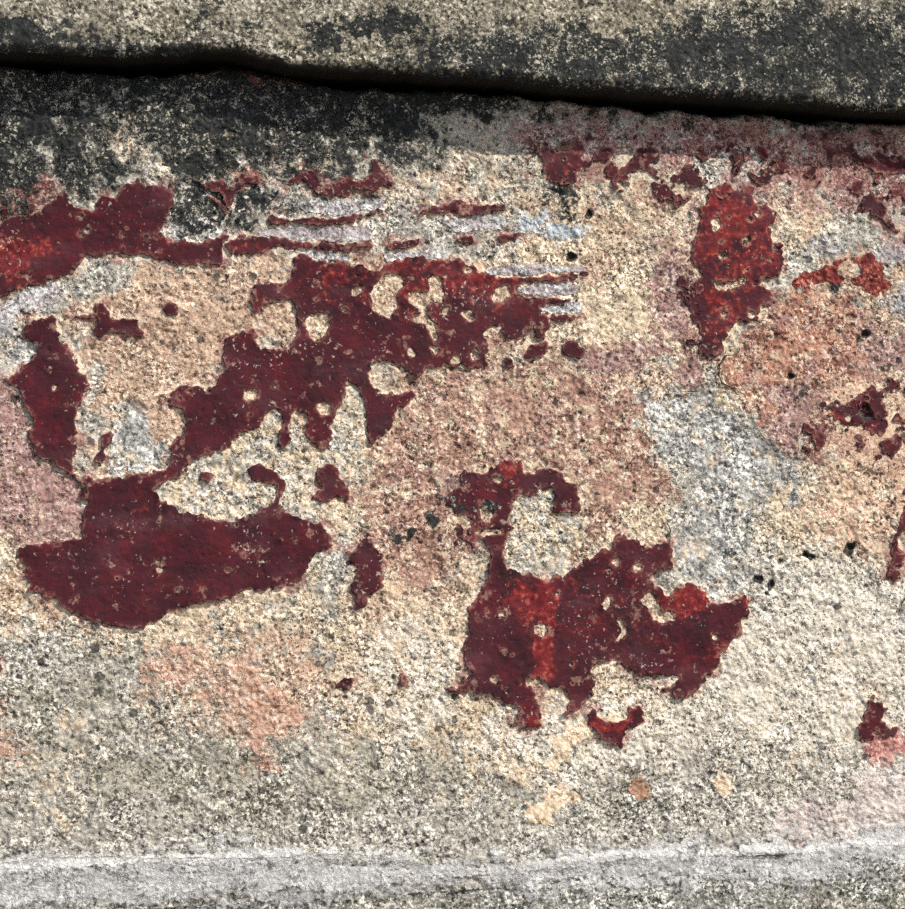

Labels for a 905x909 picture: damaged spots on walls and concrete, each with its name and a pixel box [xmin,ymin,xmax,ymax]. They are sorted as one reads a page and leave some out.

leakage [0,2,215,59]
leakage [243,19,263,32]
leakage [0,68,435,262]
peeling [804,133,905,233]
leakage [383,248,446,262]
leakage [485,264,586,314]
peeling [535,133,792,356]
peeling [0,159,589,629]
peeling [445,377,905,749]
peeling [336,678,354,690]